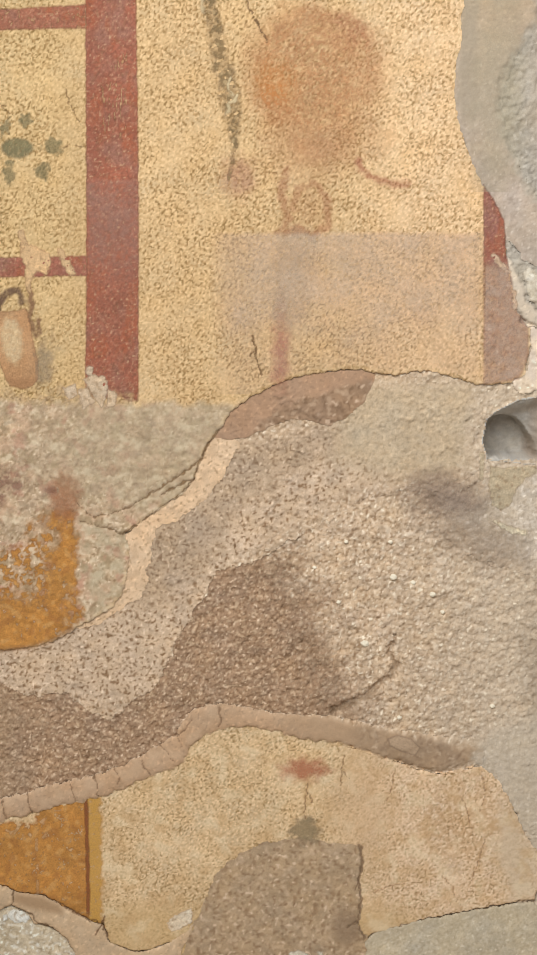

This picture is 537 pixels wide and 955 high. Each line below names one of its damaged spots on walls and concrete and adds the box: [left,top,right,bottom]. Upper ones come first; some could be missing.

peeling [63,366,117,409]
crack [77,430,219,535]
flaking render [76,429,241,629]
spalling [480,396,537,480]
spalling [0,557,348,799]